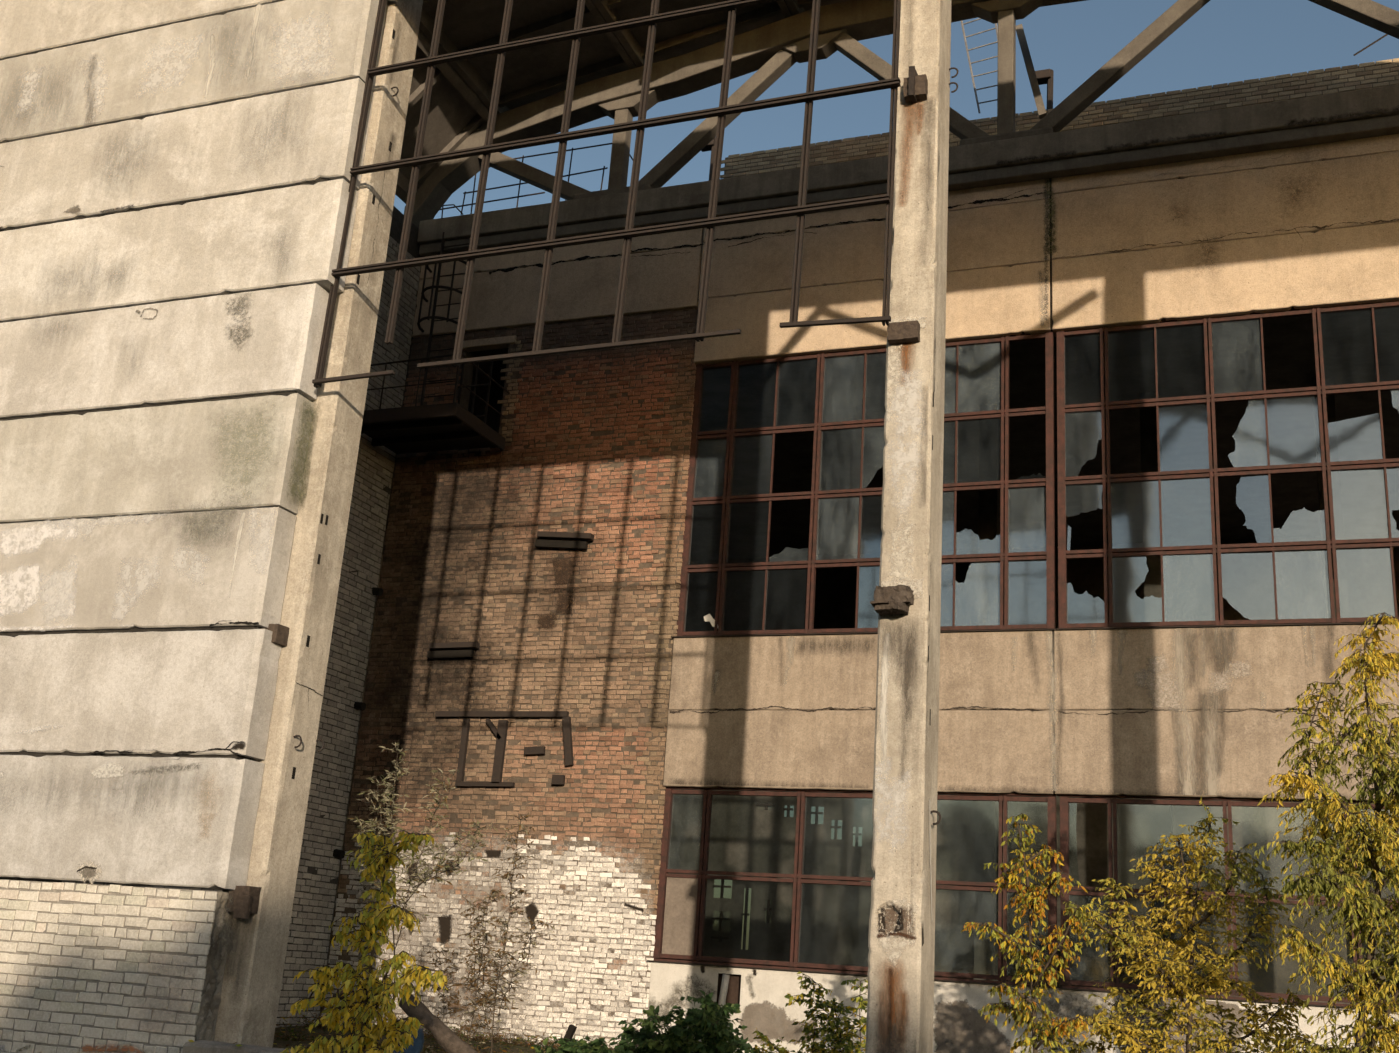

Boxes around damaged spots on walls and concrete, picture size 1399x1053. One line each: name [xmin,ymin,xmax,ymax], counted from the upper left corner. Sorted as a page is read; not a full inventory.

crack [938,134,1046,209]
crack [489,218,886,275]
crack [1053,219,1399,259]
peeling [0,514,165,631]
crack [927,593,1317,715]
water stain [1173,628,1235,795]
spalling [877,899,924,966]
rust [880,966,905,1053]
flaking render [933,999,1015,1053]
flaking render [1121,997,1253,1053]